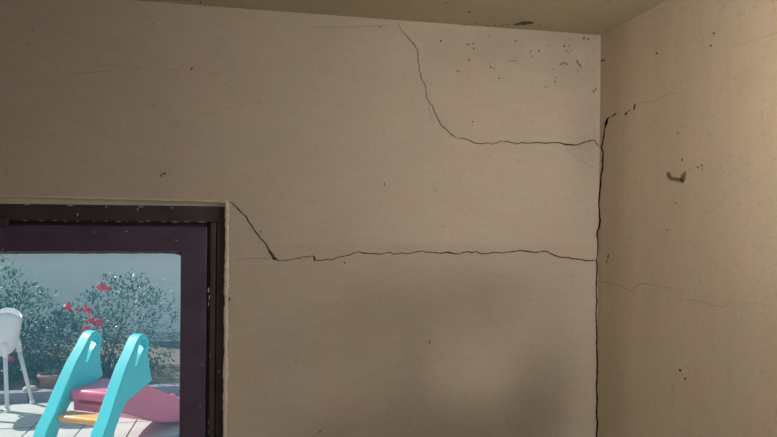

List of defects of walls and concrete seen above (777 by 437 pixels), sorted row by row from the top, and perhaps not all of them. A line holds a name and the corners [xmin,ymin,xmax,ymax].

crack [229,24,635,437]